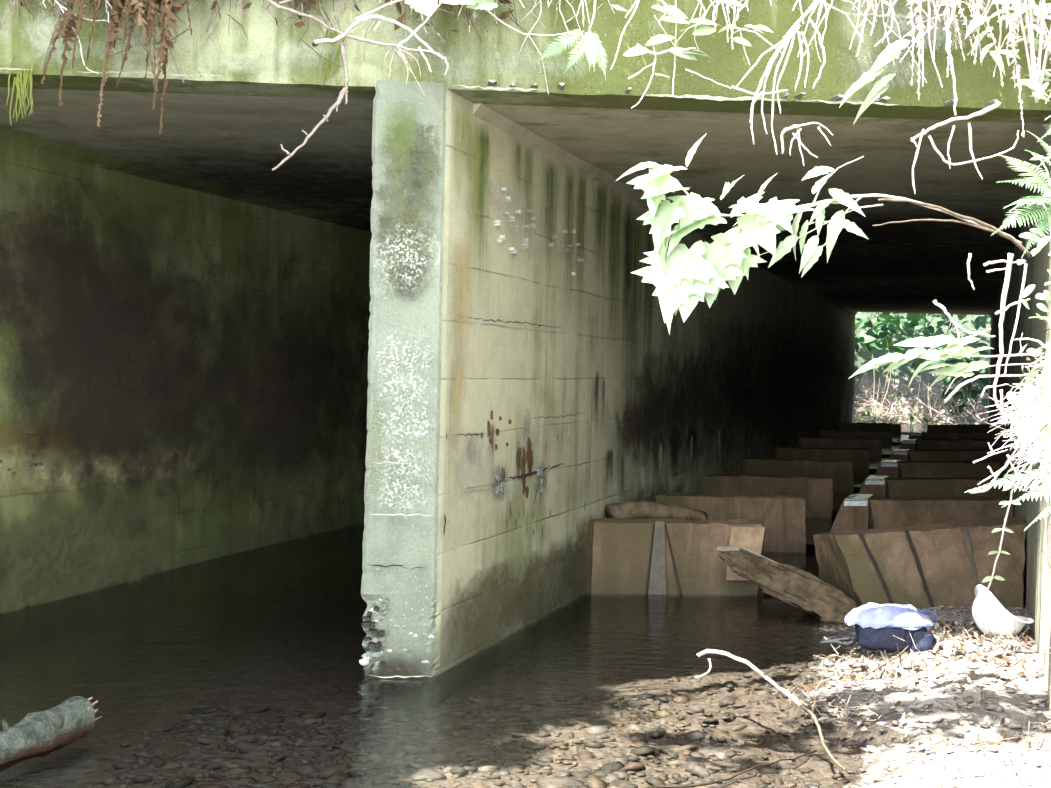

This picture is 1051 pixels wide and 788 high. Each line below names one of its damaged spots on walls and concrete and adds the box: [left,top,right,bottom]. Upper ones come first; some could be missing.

leakage [118,112,441,298]
leakage [458,112,489,229]
corrosion [481,410,533,498]
spalling [359,591,435,671]
leakage [448,516,607,653]